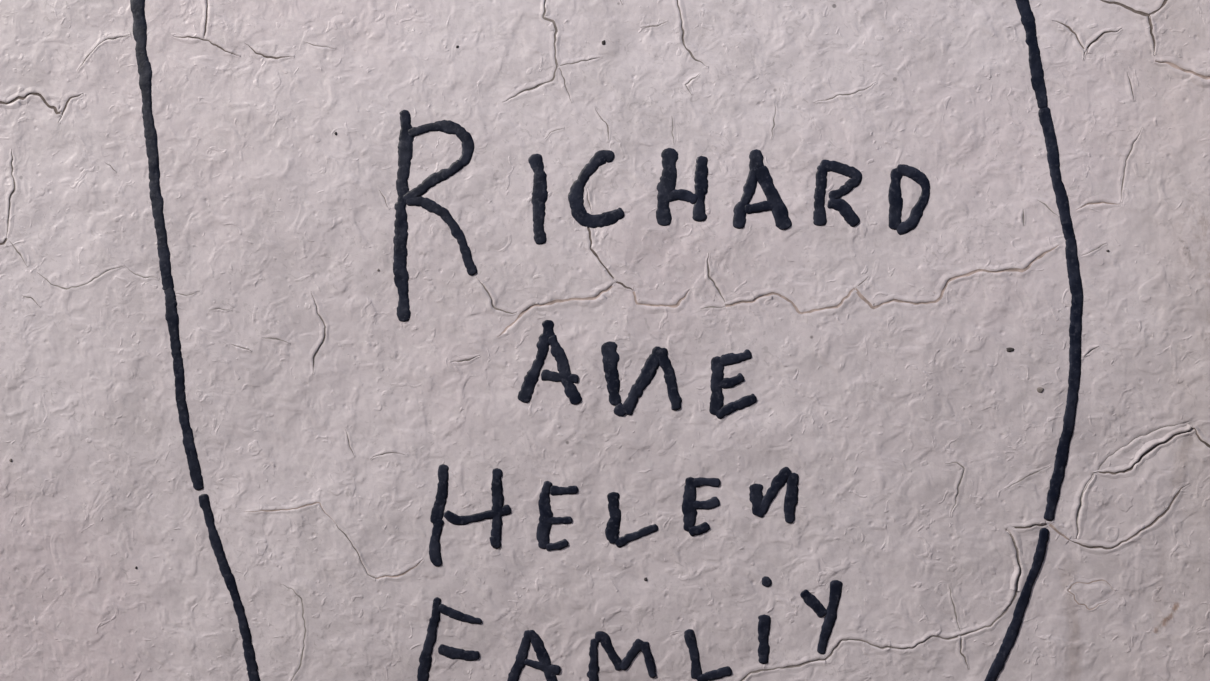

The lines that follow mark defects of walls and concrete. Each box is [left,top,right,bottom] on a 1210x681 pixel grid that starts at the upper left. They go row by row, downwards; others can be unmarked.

crack [0,33,131,124]
crack [0,149,232,313]
crack [450,0,1210,366]
crack [230,291,330,375]
crack [734,417,1210,681]
crack [661,673,697,681]